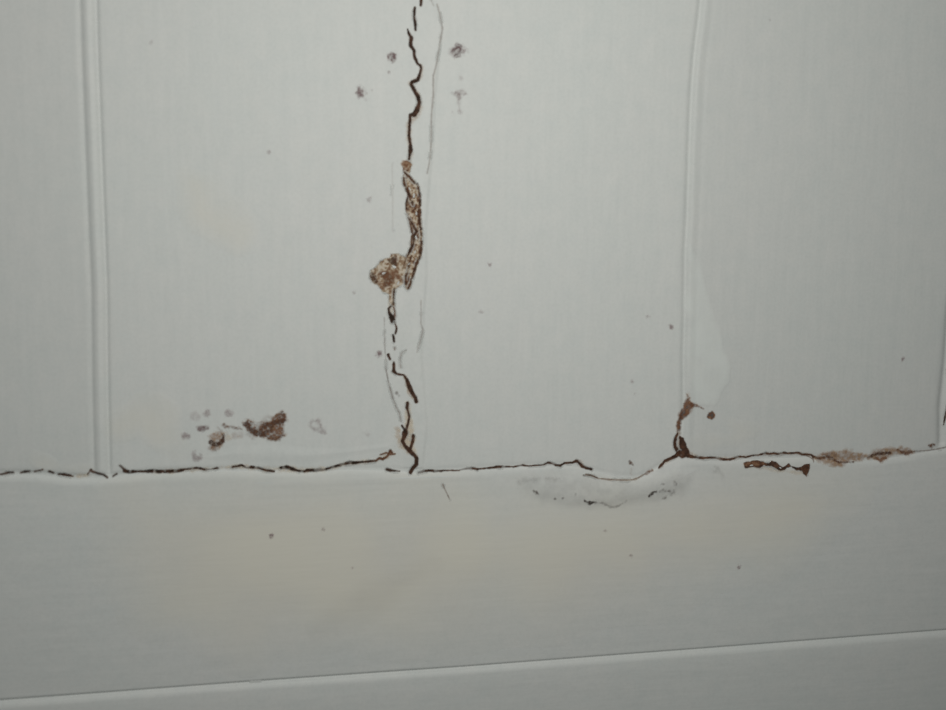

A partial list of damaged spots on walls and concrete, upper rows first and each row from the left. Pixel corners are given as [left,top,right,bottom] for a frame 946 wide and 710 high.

crack [407,0,423,160]
crack [0,288,644,480]
rust [209,413,286,449]
rust [647,398,715,472]
crack [693,452,825,461]
rust [814,449,913,466]